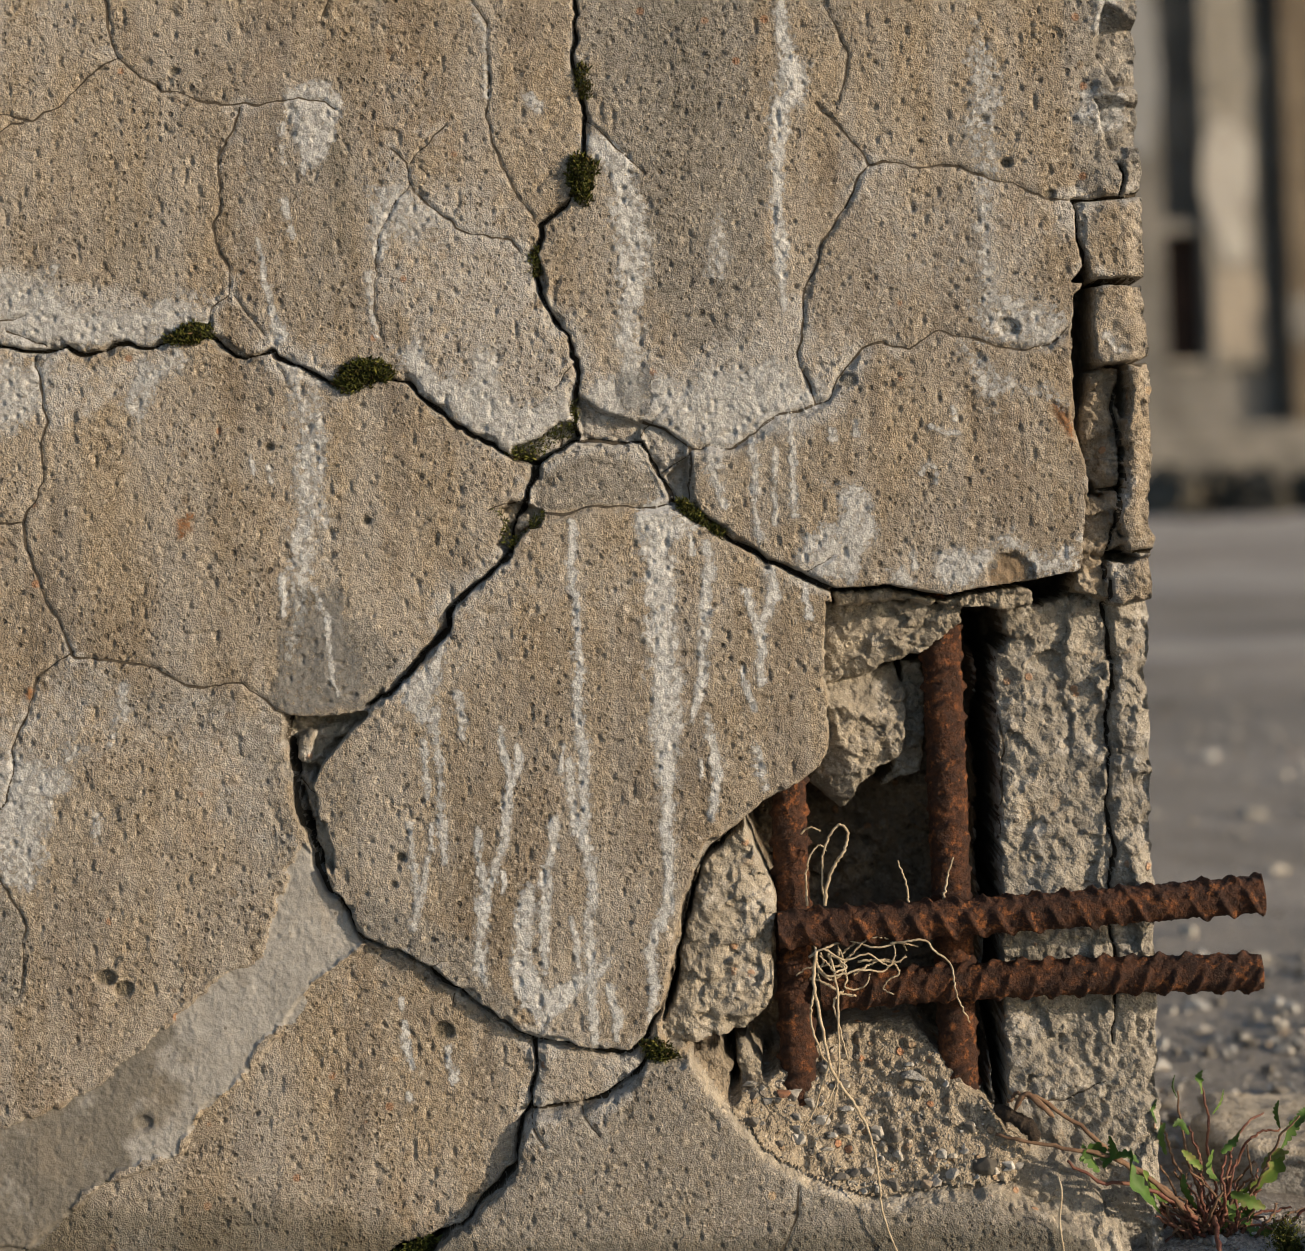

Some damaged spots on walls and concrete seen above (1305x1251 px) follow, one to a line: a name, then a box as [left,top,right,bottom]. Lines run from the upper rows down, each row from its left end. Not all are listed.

crack [0,0,349,387]
crack [0,315,468,1009]
water stain [277,79,345,175]
water stain [472,518,624,1049]
crack [440,832,726,1242]
water stain [364,133,833,543]
water stain [635,498,724,1023]
spalling [662,797,780,1103]
crack [370,0,1136,705]
spalling [811,938,935,1020]
spalling [805,199,1155,908]
spalling [975,992,1165,1251]